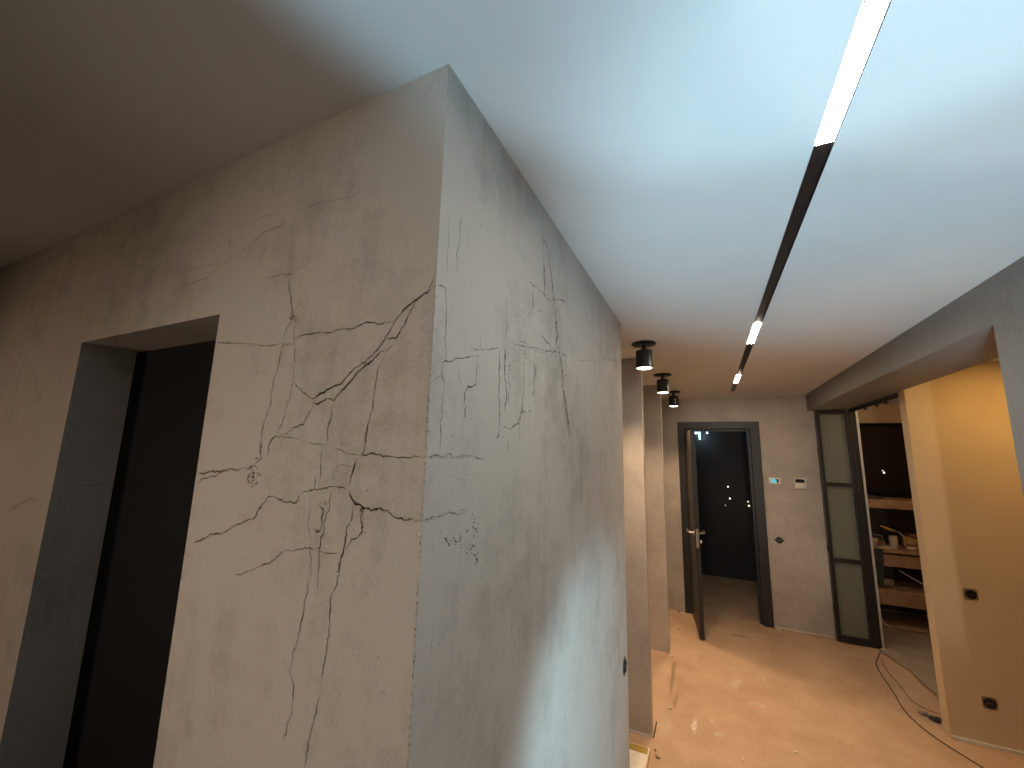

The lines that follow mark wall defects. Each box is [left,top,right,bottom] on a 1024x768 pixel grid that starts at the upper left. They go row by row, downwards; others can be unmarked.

crack [196,246,570,762]